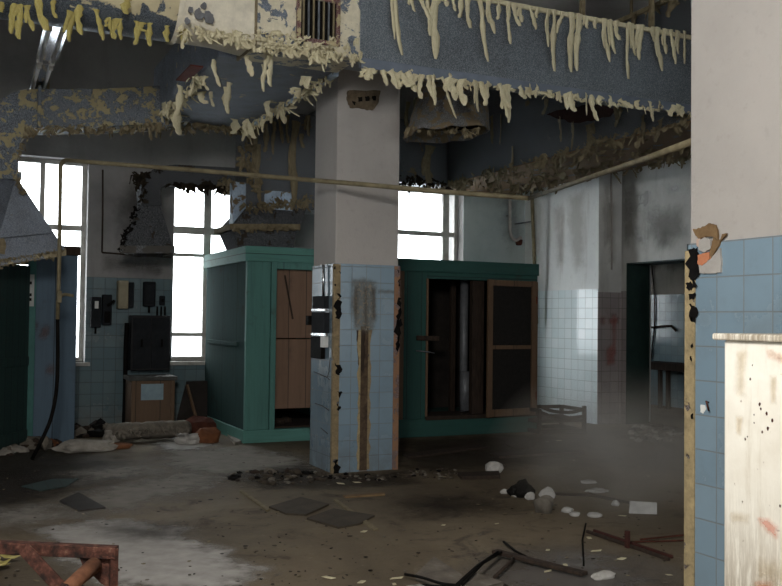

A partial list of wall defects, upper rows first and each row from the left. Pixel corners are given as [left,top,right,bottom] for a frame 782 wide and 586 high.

peeling [0,0,186,46]
peeling [390,0,686,79]
peeling [171,84,184,135]
peeling [197,55,301,210]
spalling [346,68,685,150]
peeling [333,284,342,319]
peeling [394,297,403,352]
spalling [685,223,728,323]
peeling [356,326,372,471]